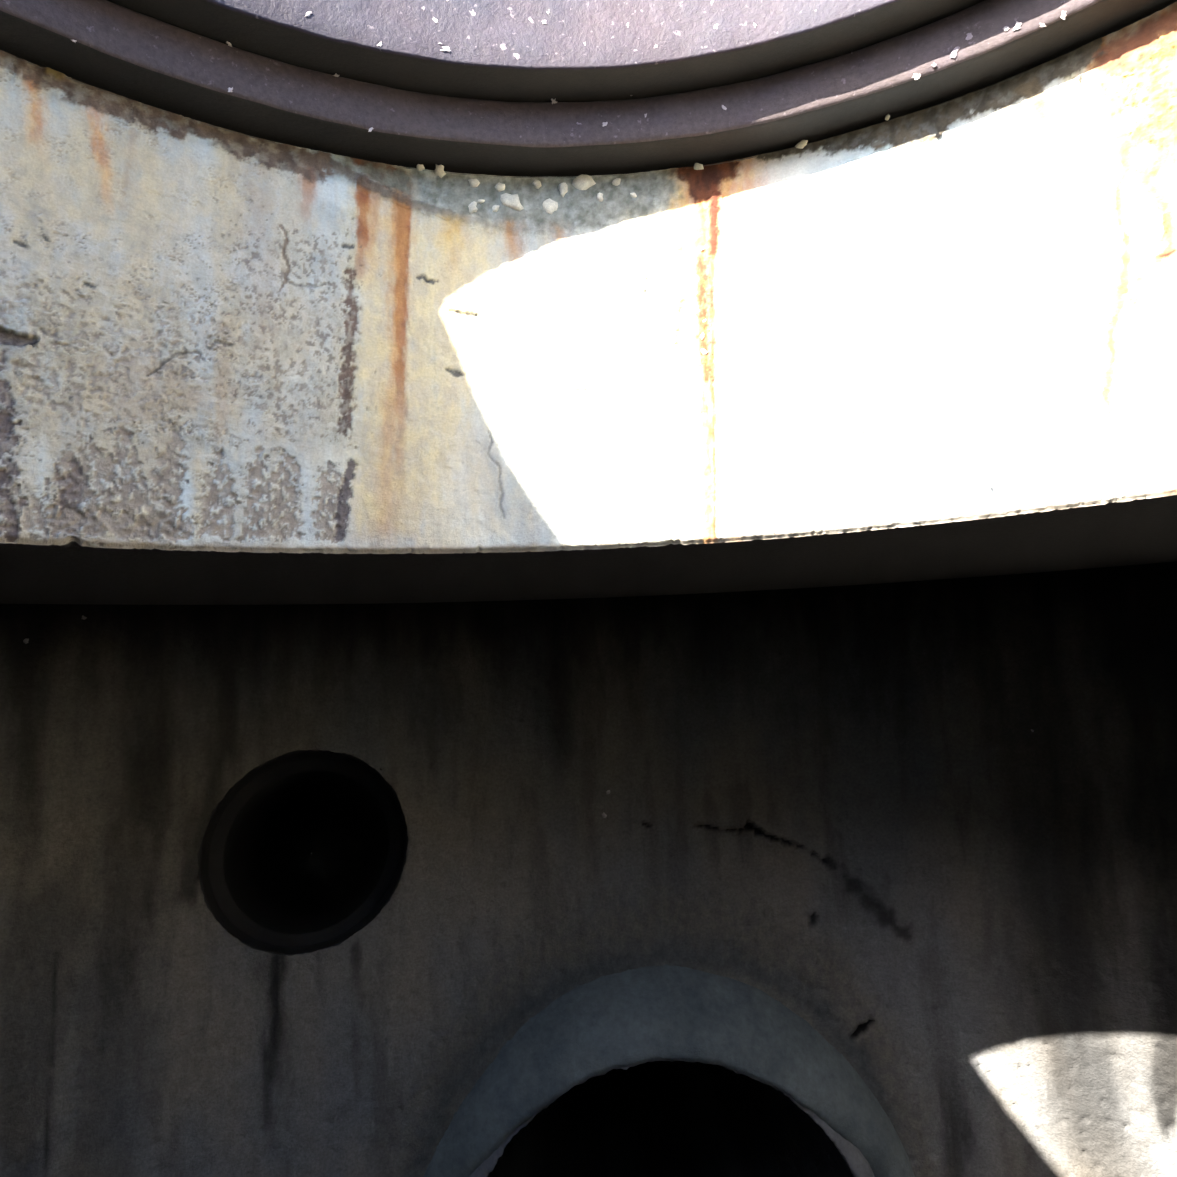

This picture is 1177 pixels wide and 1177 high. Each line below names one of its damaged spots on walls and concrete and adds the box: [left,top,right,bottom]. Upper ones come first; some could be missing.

corrosion [1071,2,1177,213]
peeling [0,202,386,544]
leakage [0,69,691,554]
corrosion [348,185,581,549]
corrosion [658,154,810,544]
leakage [750,407,1145,541]
corrosion [1124,257,1177,498]
leakage [0,561,1177,1177]
crack [691,819,921,950]